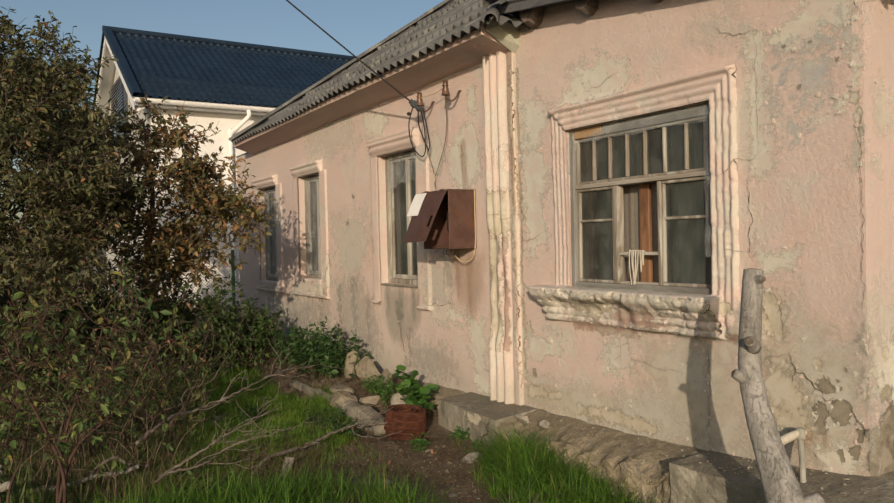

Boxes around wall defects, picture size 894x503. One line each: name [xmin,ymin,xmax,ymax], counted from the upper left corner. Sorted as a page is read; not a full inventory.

peeling [426,48,753,457]
crack [712,26,758,256]
flaking render [740,0,894,475]
crack [615,299,733,451]
water stain [866,400,894,477]